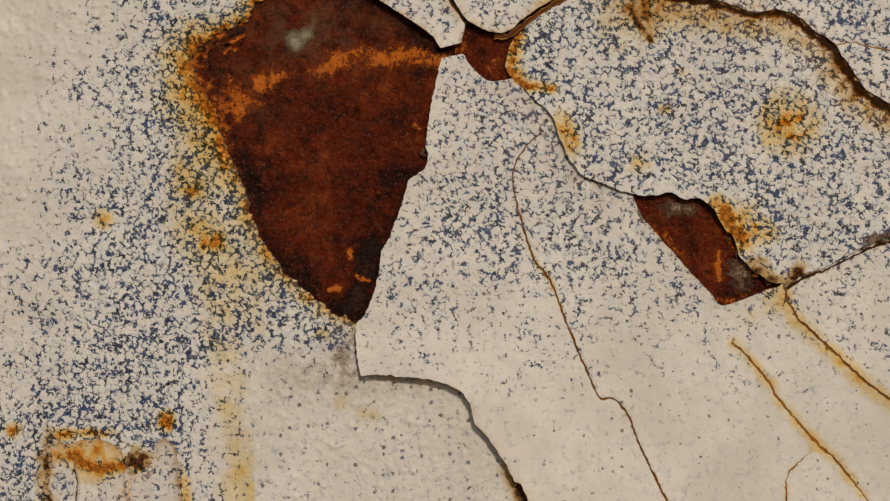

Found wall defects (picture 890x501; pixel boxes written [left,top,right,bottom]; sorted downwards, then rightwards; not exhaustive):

crack [449,0,469,25]
crack [494,0,565,40]
rust [633,0,653,42]
crack [666,0,890,117]
peeling [189,0,890,501]
rust [720,205,746,243]
crack [512,130,668,501]
crack [784,231,890,400]
crack [732,342,869,501]
peeling [48,438,183,501]
rust [125,451,149,469]